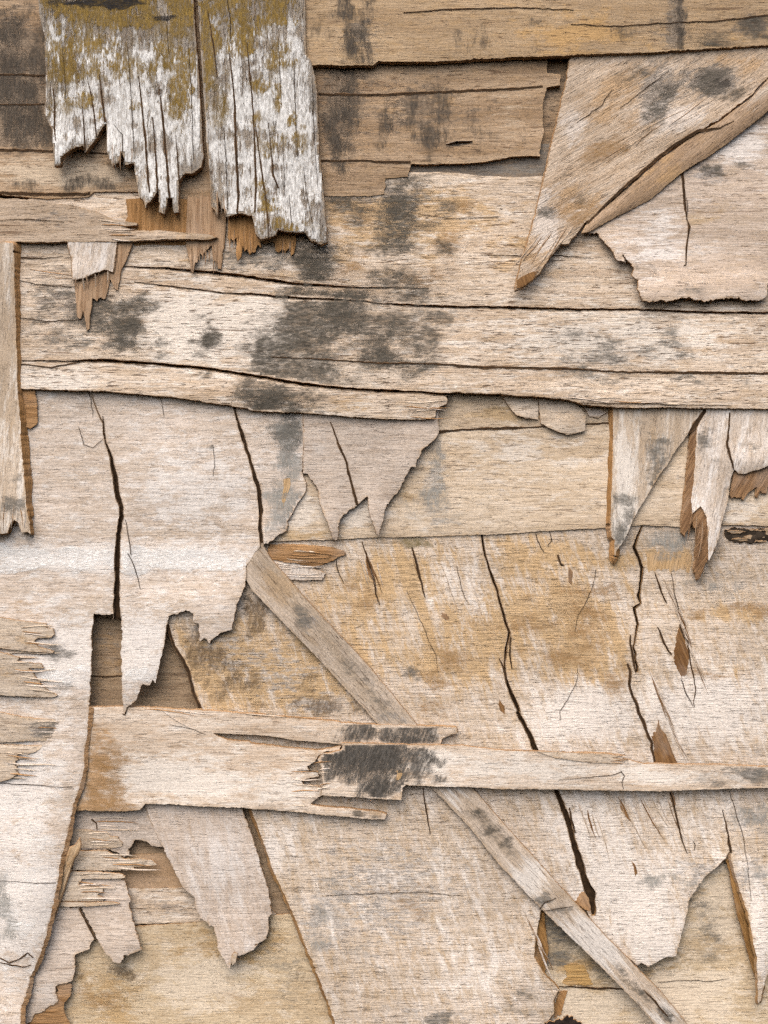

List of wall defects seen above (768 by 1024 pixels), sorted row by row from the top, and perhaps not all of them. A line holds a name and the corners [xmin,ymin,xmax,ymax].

peeling [43,17,326,241]
water stain [329,175,465,256]
water stain [32,287,157,350]
water stain [227,245,452,532]
crack [78,392,140,619]
peeling [0,542,248,576]
spalling [724,527,768,543]
crack [480,535,539,750]
crack [627,525,696,761]
water stain [321,724,445,797]
peeling [54,838,82,919]
crack [539,771,625,916]